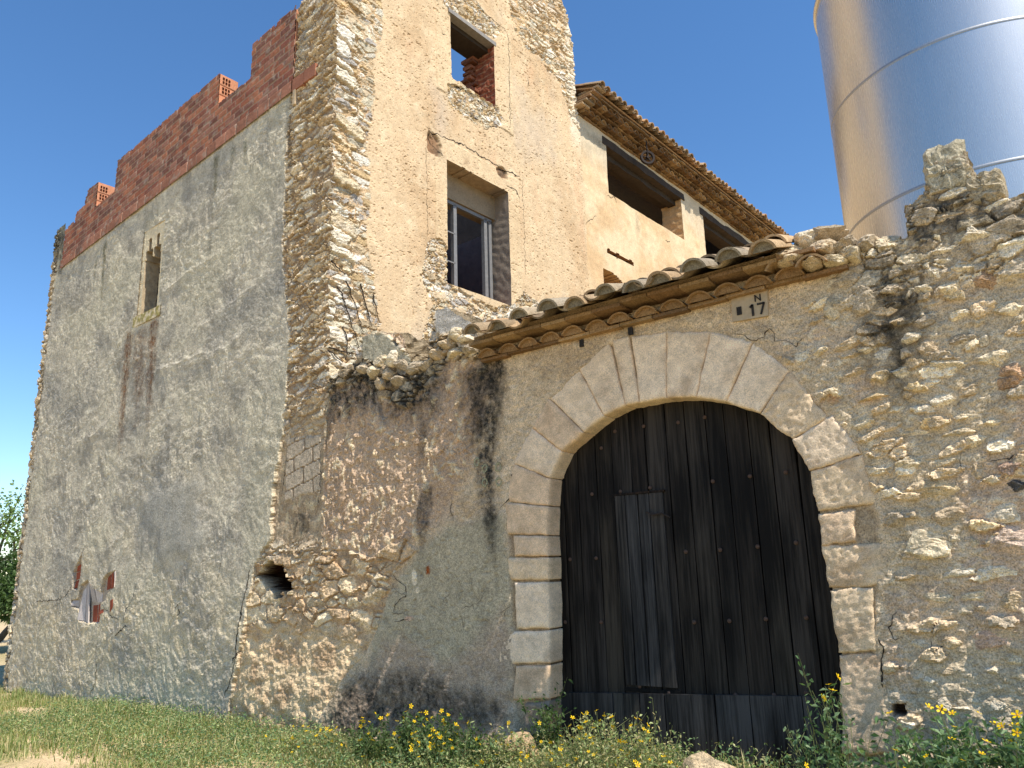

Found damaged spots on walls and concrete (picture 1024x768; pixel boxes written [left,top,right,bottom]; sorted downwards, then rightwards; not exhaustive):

crack [426,5,529,275]
spalling [282,0,539,429]
corrosion [122,321,156,419]
crack [734,324,802,347]
damp [876,267,906,373]
damp [468,360,504,524]
spalling [69,550,117,627]
crack [224,570,250,695]
spalling [226,540,417,735]
crack [877,614,902,691]